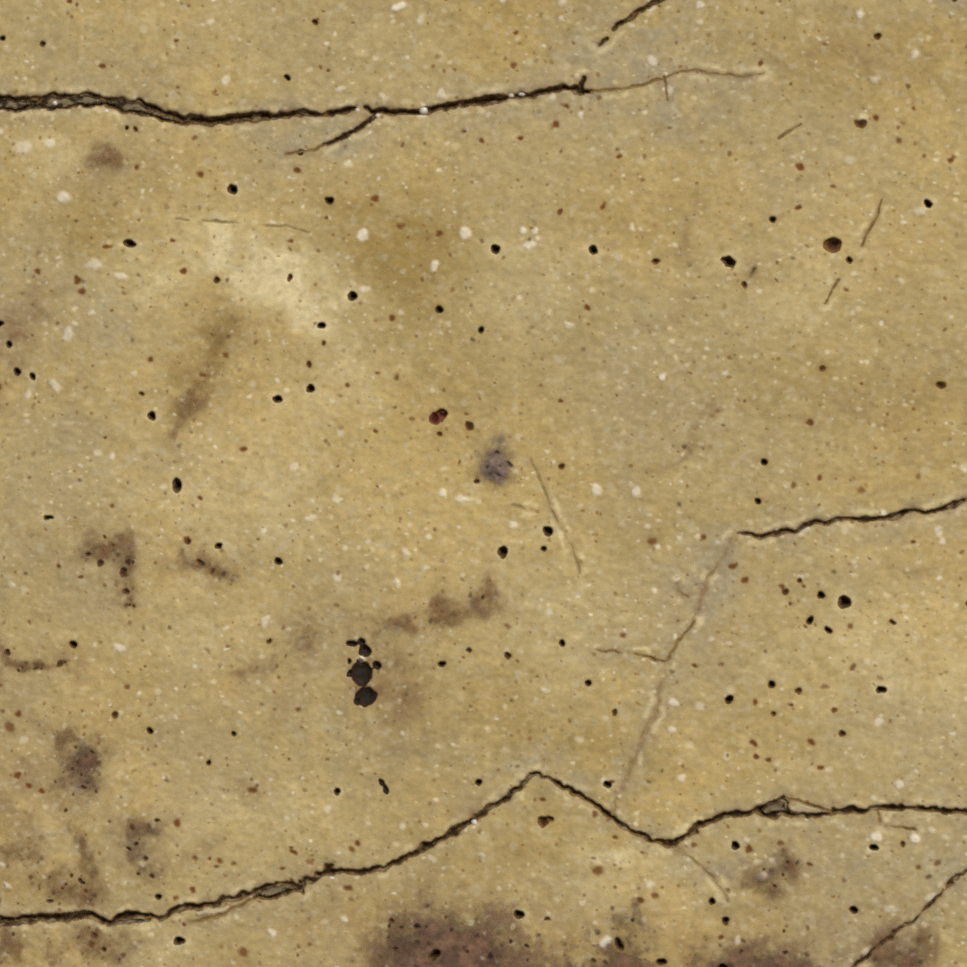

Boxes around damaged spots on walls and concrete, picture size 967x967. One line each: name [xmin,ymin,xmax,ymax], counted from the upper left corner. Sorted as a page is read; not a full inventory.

crack [598,0,664,46]
crack [0,69,764,155]
crack [596,498,967,663]
crack [0,688,967,927]
damp [372,909,652,967]
damp [711,938,812,967]
crack [852,869,967,967]